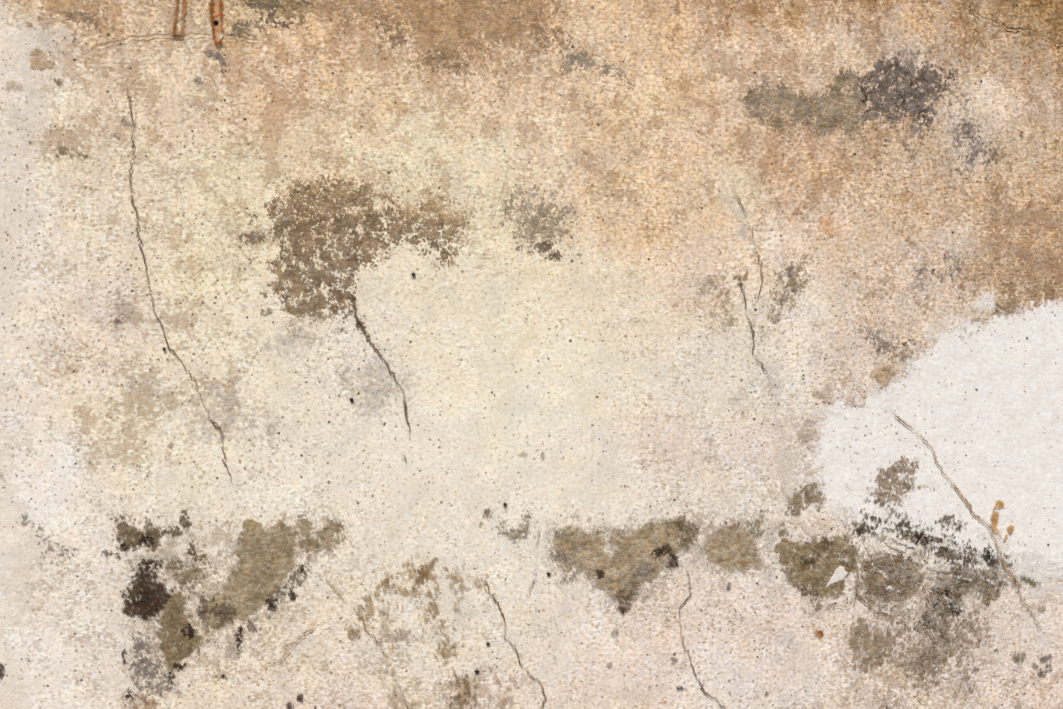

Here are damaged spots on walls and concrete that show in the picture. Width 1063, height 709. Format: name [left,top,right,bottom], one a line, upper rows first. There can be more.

rust [172,0,186,38]
rust [209,0,223,46]
water stain [738,39,1009,179]
crack [126,91,231,480]
water stain [239,165,579,354]
crack [353,306,411,461]
water stain [101,510,346,709]
water stain [479,508,531,543]
crack [483,581,547,709]
water stain [545,365,1041,704]
crack [894,414,1038,626]
rust [991,500,1015,541]